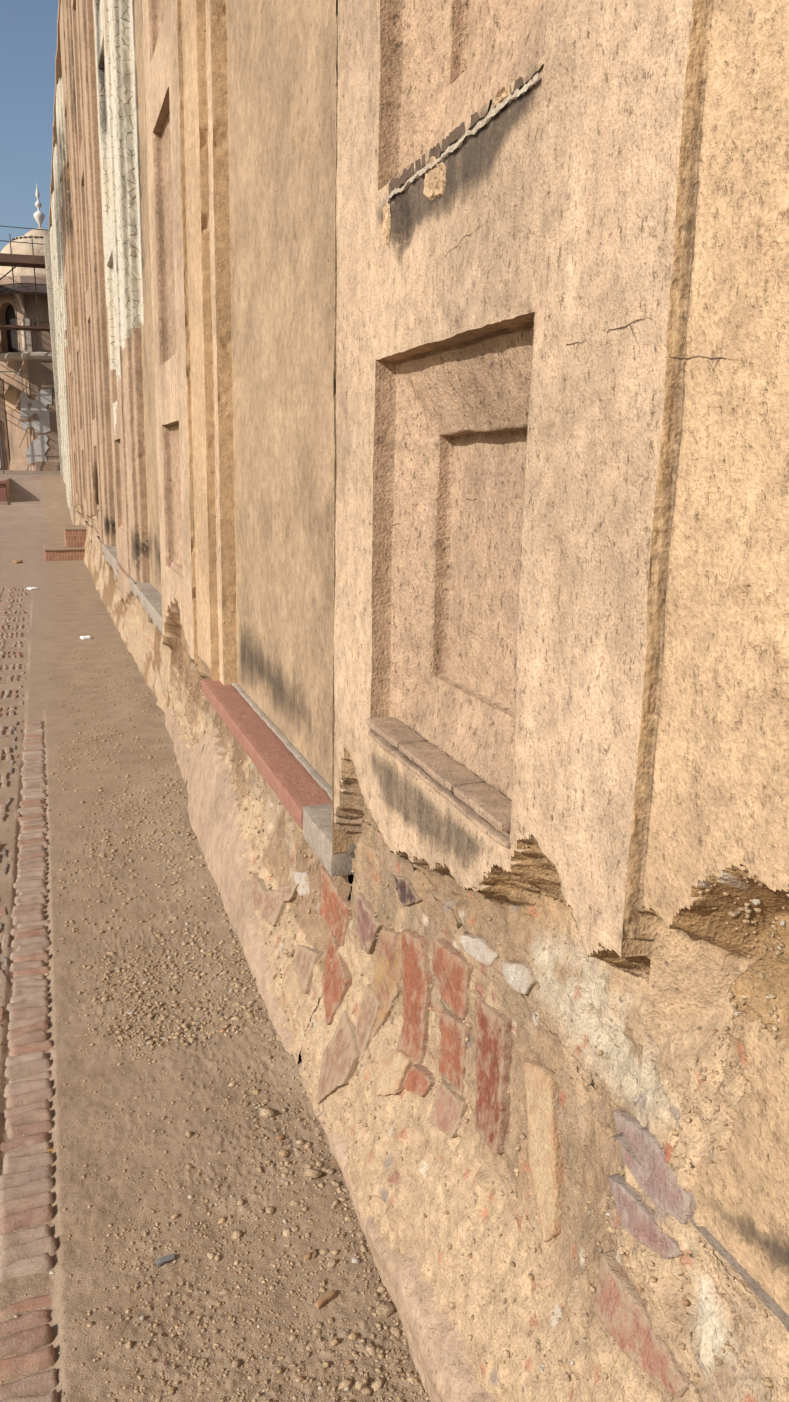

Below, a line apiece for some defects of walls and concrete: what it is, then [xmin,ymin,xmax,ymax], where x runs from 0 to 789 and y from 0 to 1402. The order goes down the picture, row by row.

peeling [423,156,447,201]
peeling [382,201,391,248]
peeling [50,74,71,508]
flaking render [4,388,52,463]
spalling [73,502,789,1402]